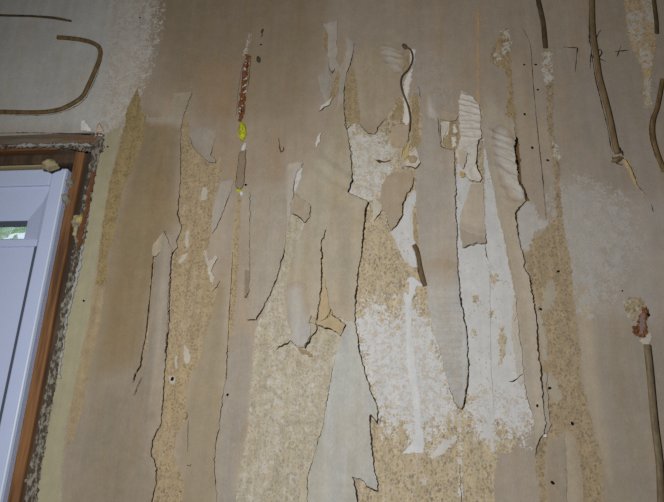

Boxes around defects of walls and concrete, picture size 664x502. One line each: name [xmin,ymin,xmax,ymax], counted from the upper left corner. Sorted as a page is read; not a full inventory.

flaking render [347,124,398,210]
flaking render [517,201,549,252]
flaking render [355,138,534,499]